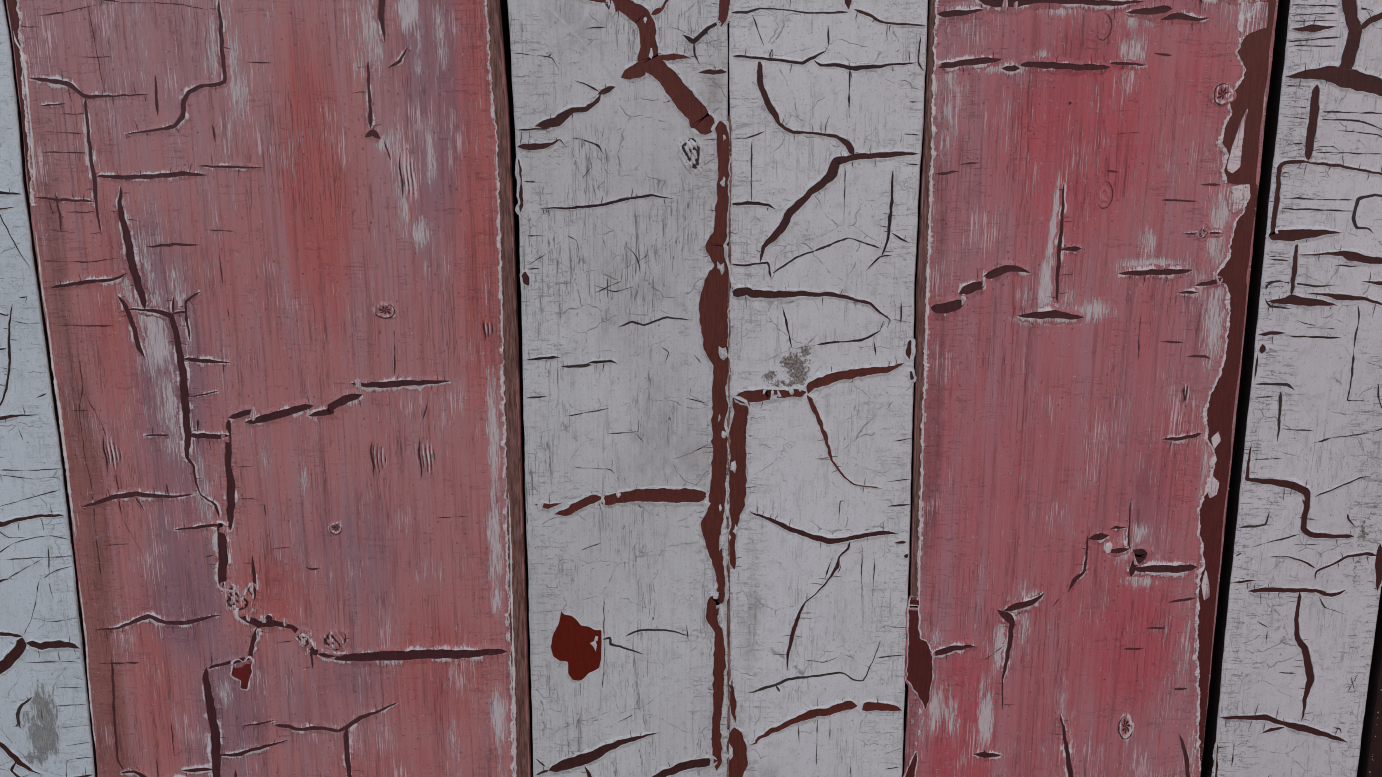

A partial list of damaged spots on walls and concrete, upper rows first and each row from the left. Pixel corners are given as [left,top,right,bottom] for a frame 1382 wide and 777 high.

crack [0,0,507,777]
peeling [548,610,604,684]
crack [516,0,1382,777]
peeling [1191,0,1276,771]